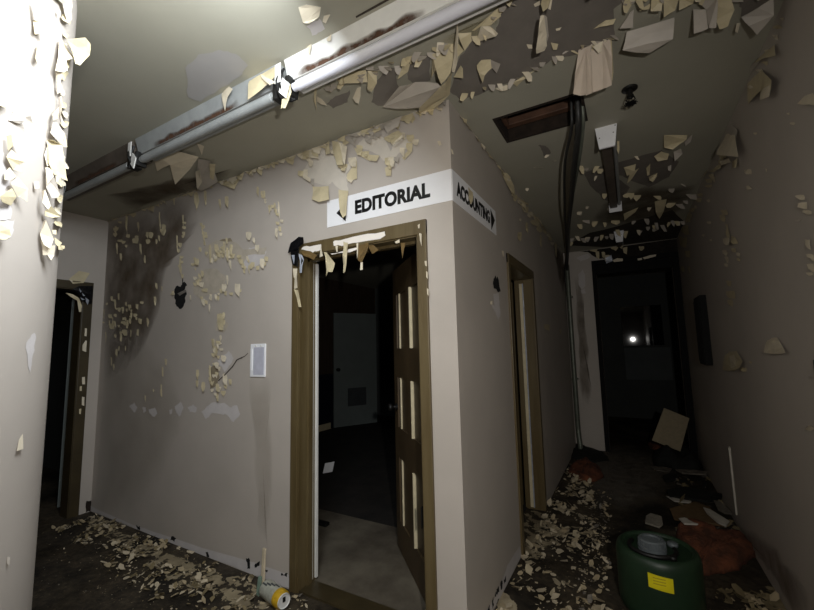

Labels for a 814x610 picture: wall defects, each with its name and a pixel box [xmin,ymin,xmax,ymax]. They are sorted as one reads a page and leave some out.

rust [301,14,417,75]
peeling [0,0,91,260]
peeling [107,0,784,264]
peeling [570,125,752,294]
flaking render [26,333,36,371]
peeling [69,271,90,284]
peeling [102,293,149,370]
water stain [111,217,184,348]
peeling [154,215,268,422]
peeling [293,269,301,307]
peeling [300,231,385,276]
spalling [490,276,500,319]